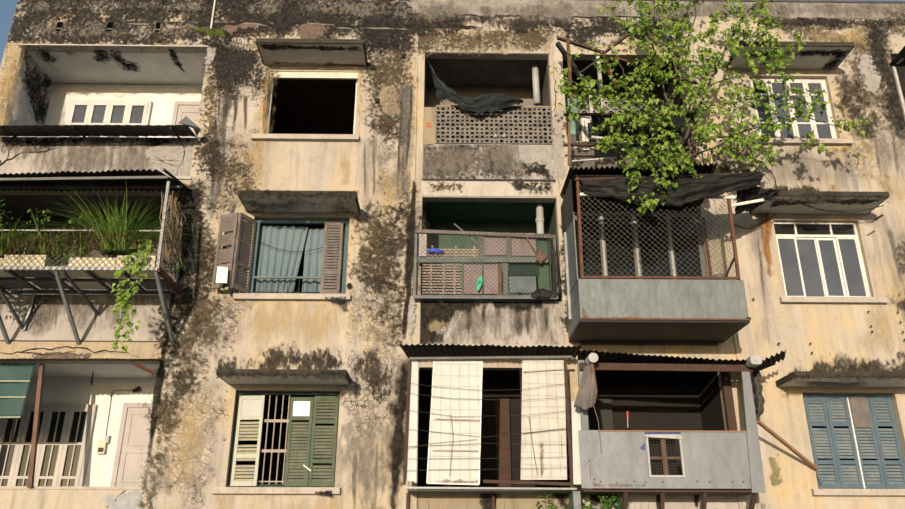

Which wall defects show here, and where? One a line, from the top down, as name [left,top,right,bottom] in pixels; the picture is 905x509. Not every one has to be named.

crack [0,145,55,166]
leakage [0,0,905,346]
corrosion [760,213,772,274]
crack [0,346,139,357]
leakage [143,317,207,453]
leakage [788,315,905,387]
peeling [103,394,182,509]
leakage [215,343,408,509]
leakage [590,495,619,509]